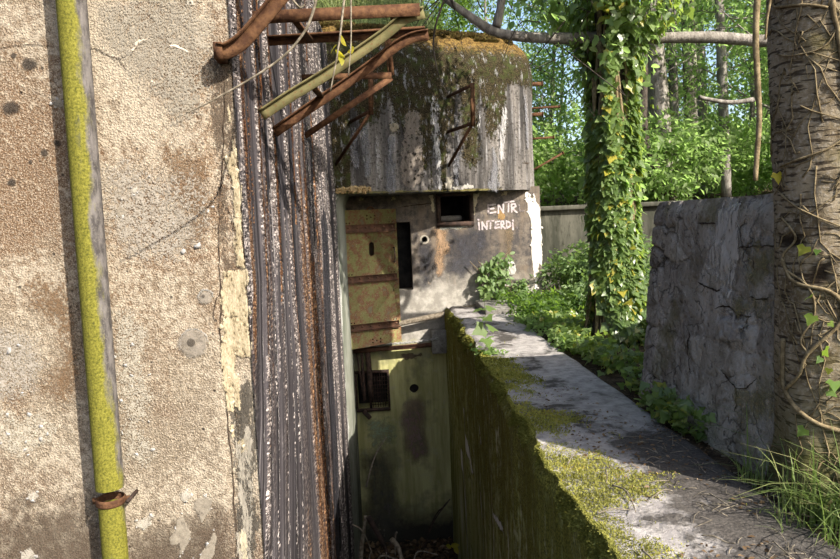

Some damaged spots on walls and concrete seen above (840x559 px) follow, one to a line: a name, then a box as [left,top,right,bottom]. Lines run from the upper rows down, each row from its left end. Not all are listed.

peeling [524,192,543,289]
flaking render [219,139,253,412]
water stain [305,97,508,559]
flaking render [229,425,248,453]
spalling [20,547,39,559]
spalling [169,513,192,557]
spalling [193,530,217,559]